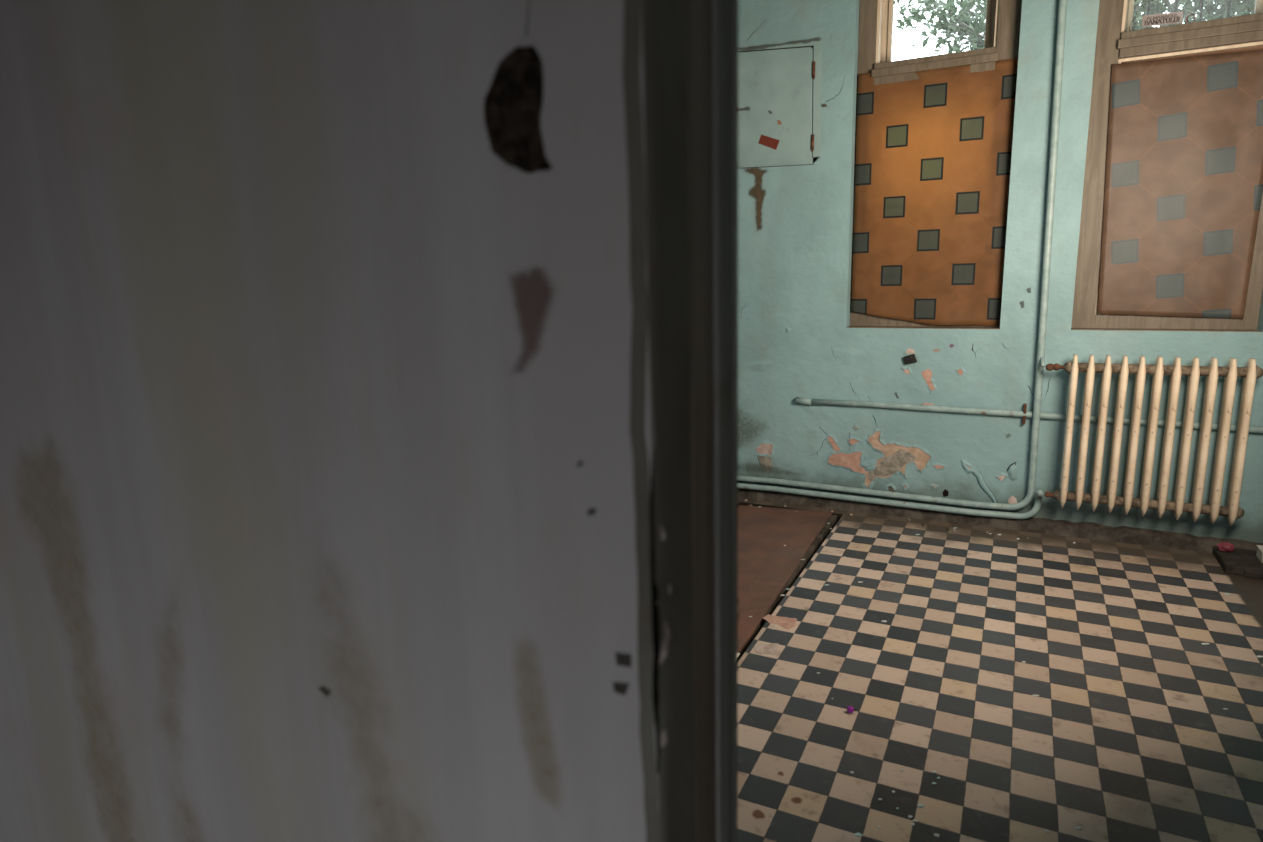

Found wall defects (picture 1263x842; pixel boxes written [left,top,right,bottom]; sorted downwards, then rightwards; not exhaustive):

corrosion [746,168,766,230]
peeling [826,424,1017,504]
flaking render [615,652,632,667]
flaking render [659,620,671,665]
flaking render [613,682,630,695]